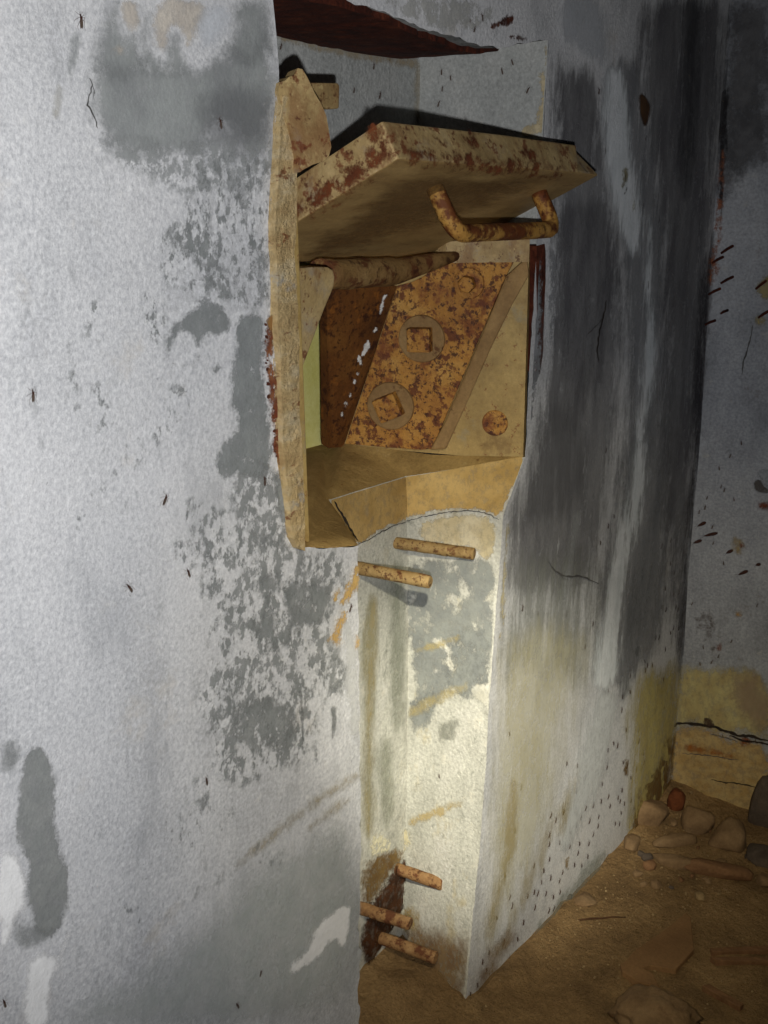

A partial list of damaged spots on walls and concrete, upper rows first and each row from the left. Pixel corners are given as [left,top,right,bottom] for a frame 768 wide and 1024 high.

water stain [98,4,274,192]
corrosion [297,123,562,218]
peeling [522,50,547,136]
water stain [167,301,288,549]
corrosion [264,316,279,464]
water stain [507,0,768,867]
crack [674,717,768,787]
water stain [0,748,68,1024]
spalling [361,918,394,964]
spalling [361,830,410,913]